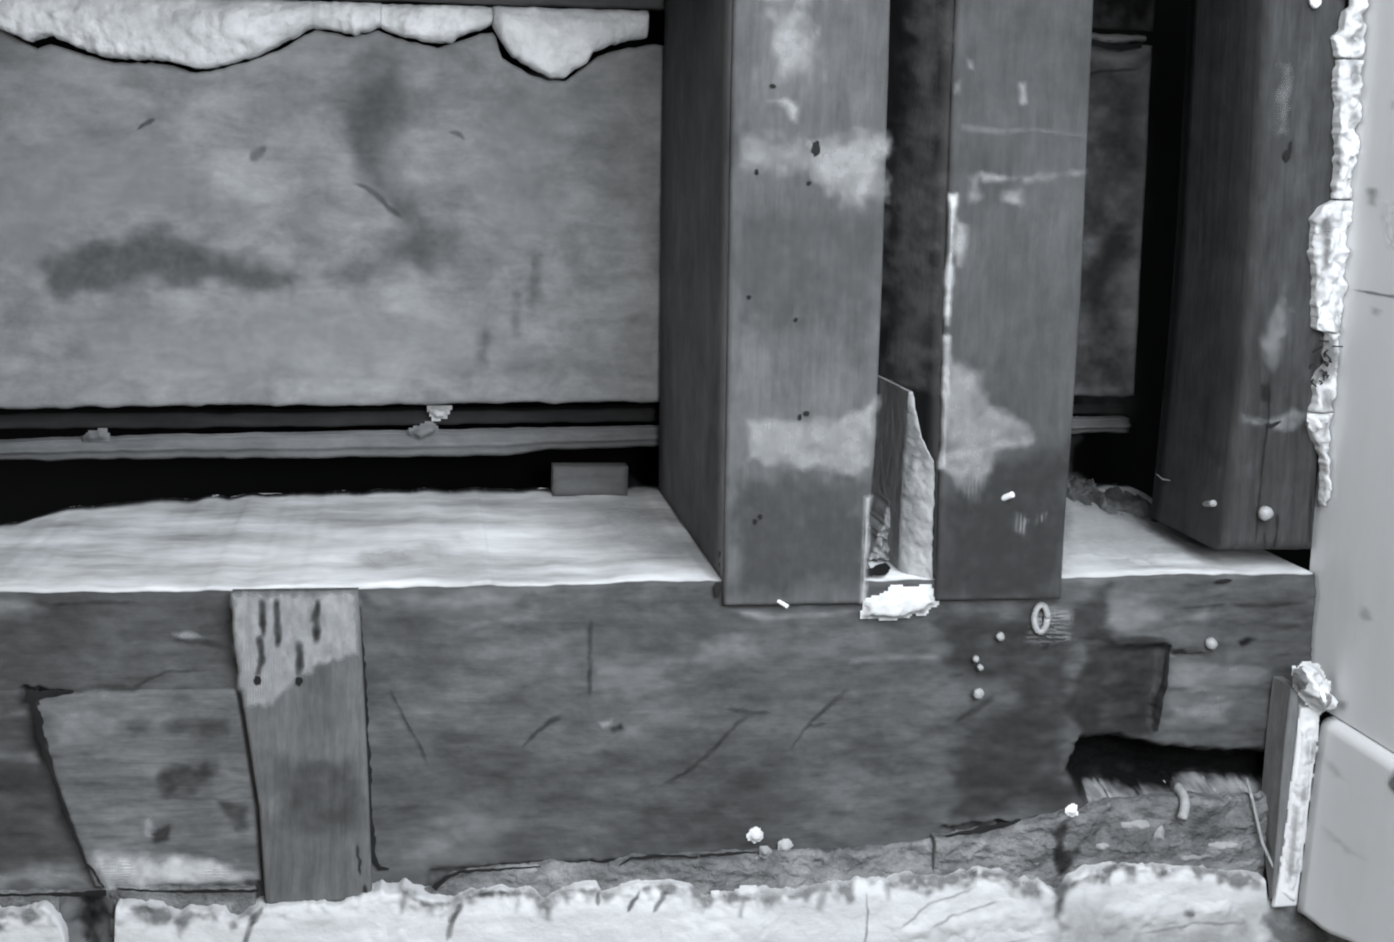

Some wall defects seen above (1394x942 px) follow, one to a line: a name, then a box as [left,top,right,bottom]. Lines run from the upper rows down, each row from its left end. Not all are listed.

water stain [54,237,270,289]
flaking render [1306,0,1368,506]
water stain [946,594,1265,814]